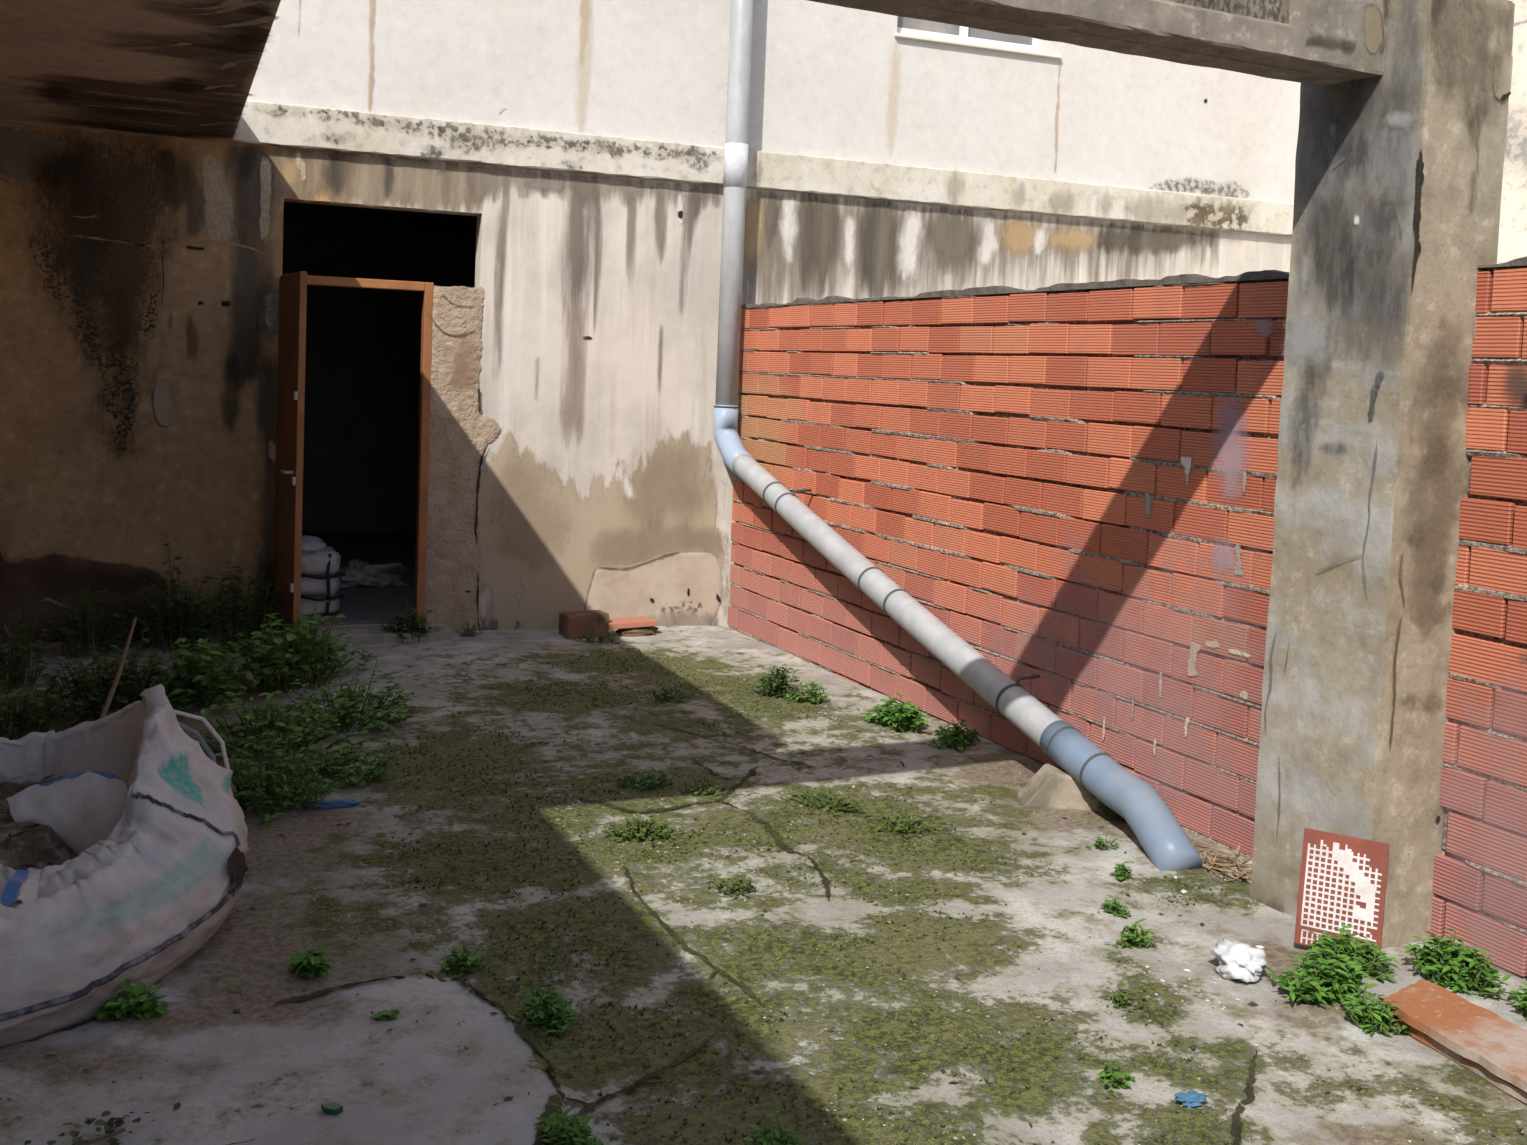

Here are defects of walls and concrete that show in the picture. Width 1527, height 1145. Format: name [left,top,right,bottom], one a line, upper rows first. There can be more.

damp [1302,0,1508,340]
damp [30,0,720,605]
damp [1218,406,1243,483]
damp [1291,318,1325,458]
flaking render [585,551,722,626]
crack [580,718,831,900]
crack [622,866,765,1007]
crack [274,974,714,1145]
crack [1230,1050,1257,1145]